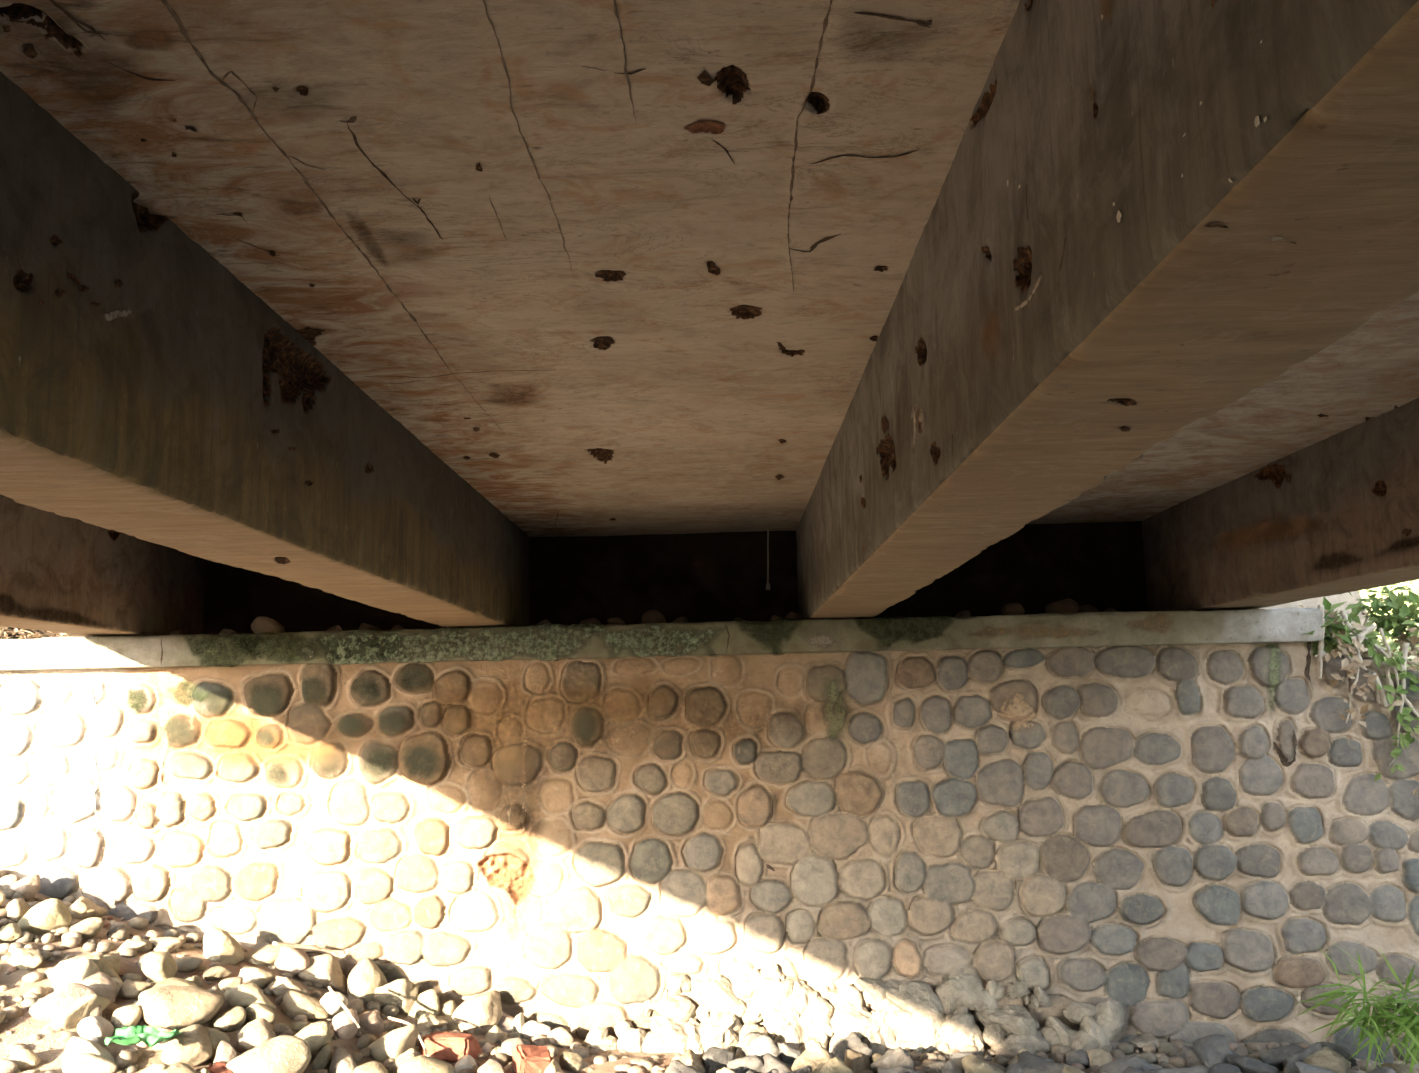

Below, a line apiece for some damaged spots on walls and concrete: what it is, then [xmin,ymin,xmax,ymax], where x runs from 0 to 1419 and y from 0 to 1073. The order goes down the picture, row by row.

spalling [0,3,83,59]
crack [854,12,932,28]
spalling [697,65,750,105]
crack [339,116,443,240]
crack [482,0,573,272]
crack [813,150,918,164]
spalling [262,327,331,414]
water stain [1385,537,1419,552]
water stain [0,595,101,626]
water stain [211,718,321,762]
water stain [367,691,737,902]
spalling [477,852,535,967]